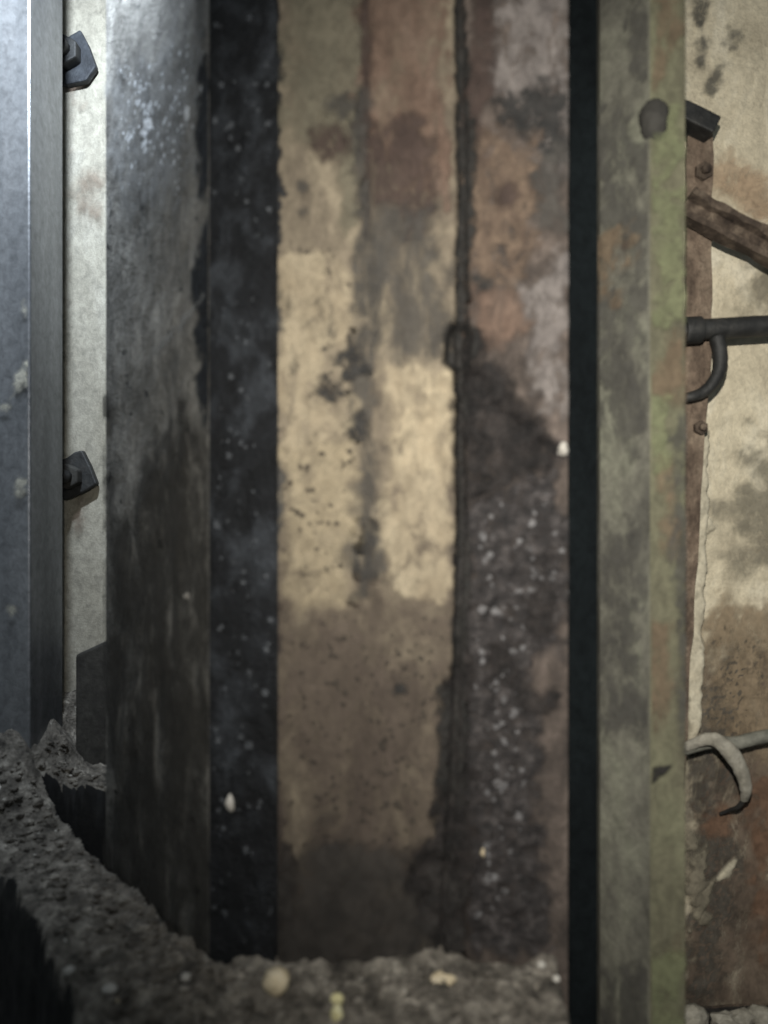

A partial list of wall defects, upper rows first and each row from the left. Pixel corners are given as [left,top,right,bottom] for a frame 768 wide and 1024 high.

water stain [278,0,454,441]
water stain [489,0,569,229]
water stain [511,253,569,414]
water stain [278,455,452,911]
spalling [225,793,235,813]